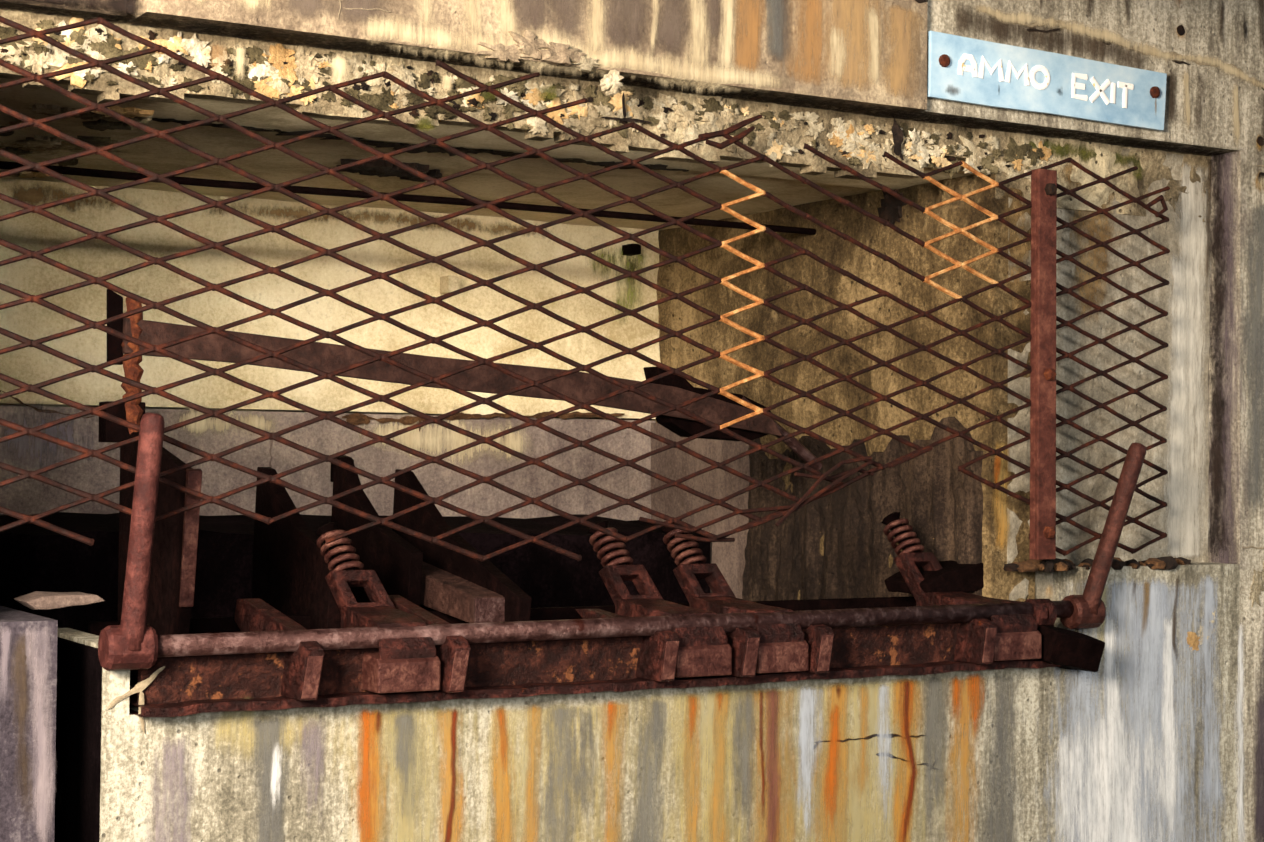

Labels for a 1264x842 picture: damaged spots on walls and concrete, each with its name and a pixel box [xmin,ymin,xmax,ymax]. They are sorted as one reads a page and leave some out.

spalling [0,17,1059,183]
leakage [1,628,53,842]
corrosion [359,710,463,842]
corrosion [493,703,624,842]
corrosion [652,692,740,842]
corrosion [757,680,920,842]
corrosion [951,675,984,842]
leakage [1237,631,1264,842]